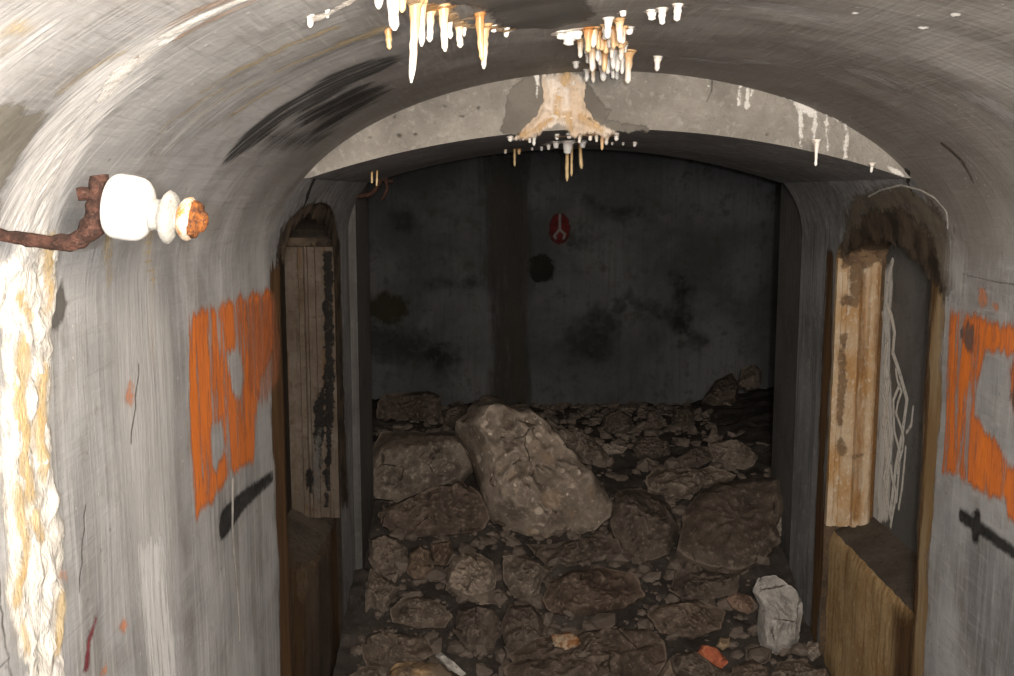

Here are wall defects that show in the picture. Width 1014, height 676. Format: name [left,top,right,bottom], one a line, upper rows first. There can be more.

leakage [447,0,595,29]
leakage [224,57,398,162]
flaking render [500,74,551,135]
flaking render [584,81,649,134]
efflorescence [737,85,754,110]
efflorescence [783,97,849,159]
leakage [0,0,258,676]
crack [0,582,12,676]